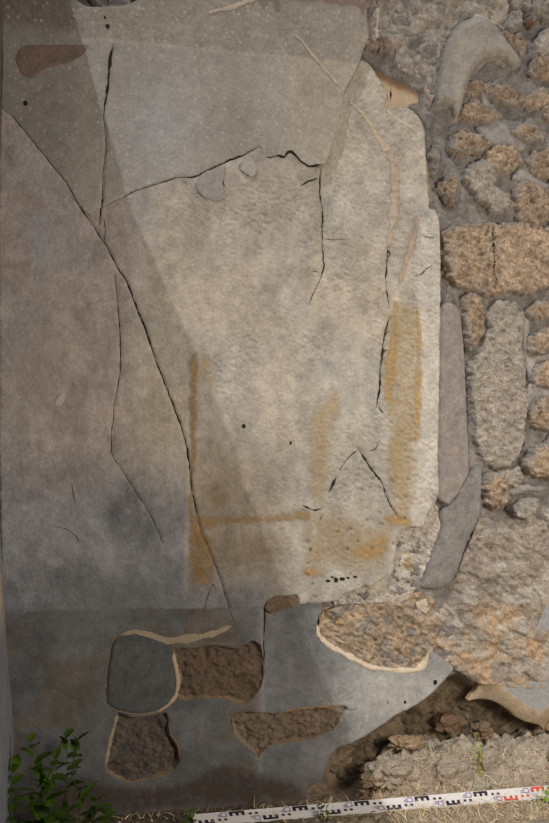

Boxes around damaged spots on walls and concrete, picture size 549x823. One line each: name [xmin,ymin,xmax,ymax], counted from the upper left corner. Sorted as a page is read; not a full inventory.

spalling [374,70,419,112]
crack [349,100,433,413]
crack [14,45,342,618]
leakage [414,311,422,441]
crack [304,444,398,522]
spalling [175,641,264,700]
spalling [316,591,441,674]
spalling [105,713,180,781]
spalling [231,705,345,755]